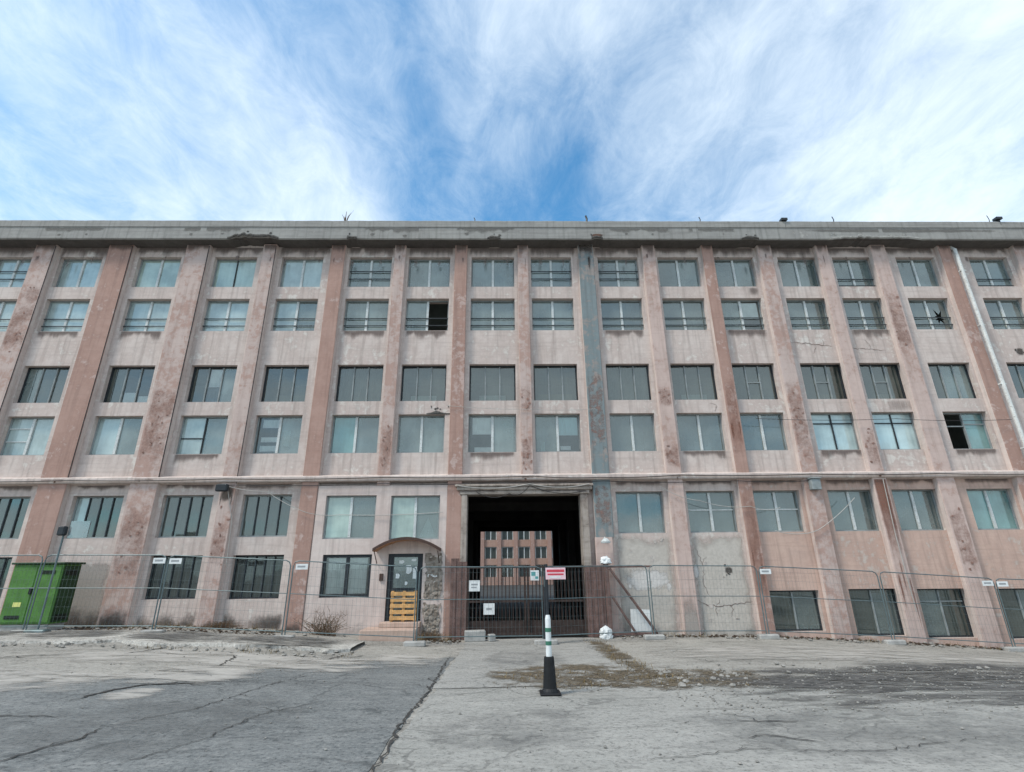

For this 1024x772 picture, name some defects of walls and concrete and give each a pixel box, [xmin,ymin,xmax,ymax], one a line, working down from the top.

crack [695,545,746,617]